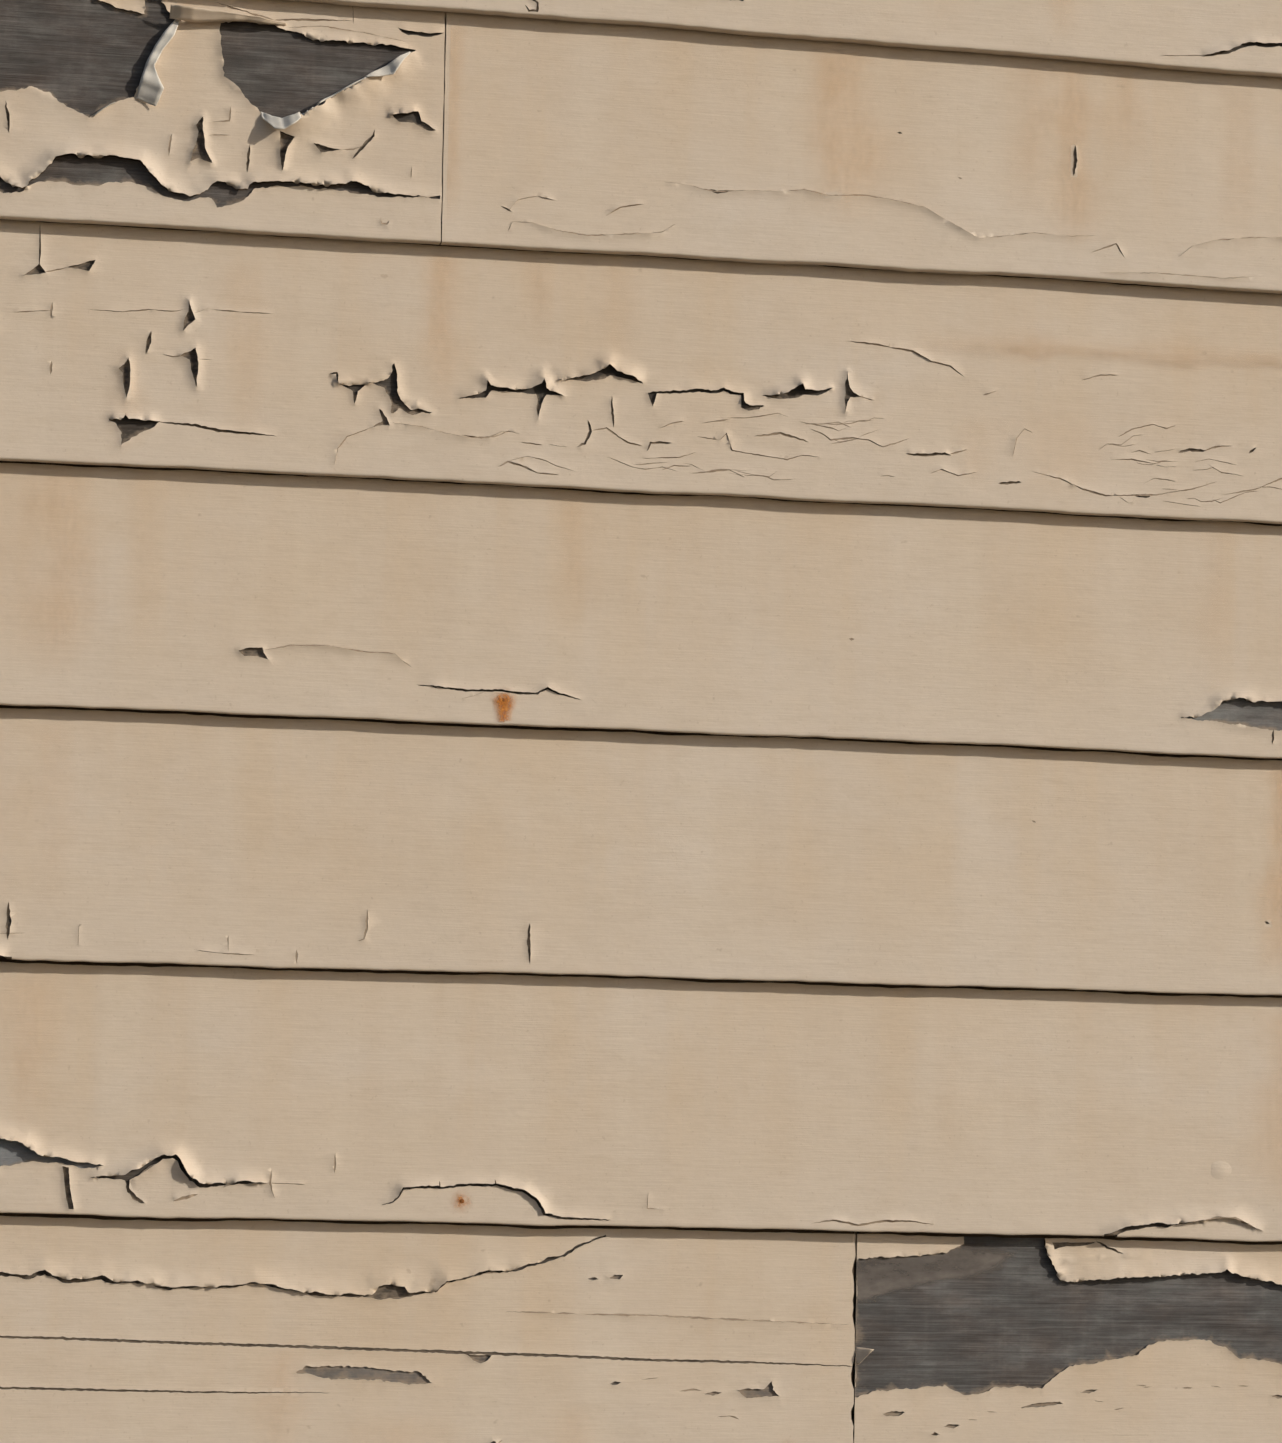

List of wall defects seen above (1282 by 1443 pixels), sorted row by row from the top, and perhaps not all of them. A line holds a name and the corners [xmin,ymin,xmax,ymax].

peeling [0,0,416,129]
crack [1164,43,1282,56]
peeling [0,155,440,208]
crack [850,341,995,395]
crack [331,364,1282,507]
rust [497,694,511,722]
peeling [1181,698,1282,742]
peeling [0,1139,304,1209]
peeling [855,1236,1282,1408]
peeling [296,1366,431,1384]